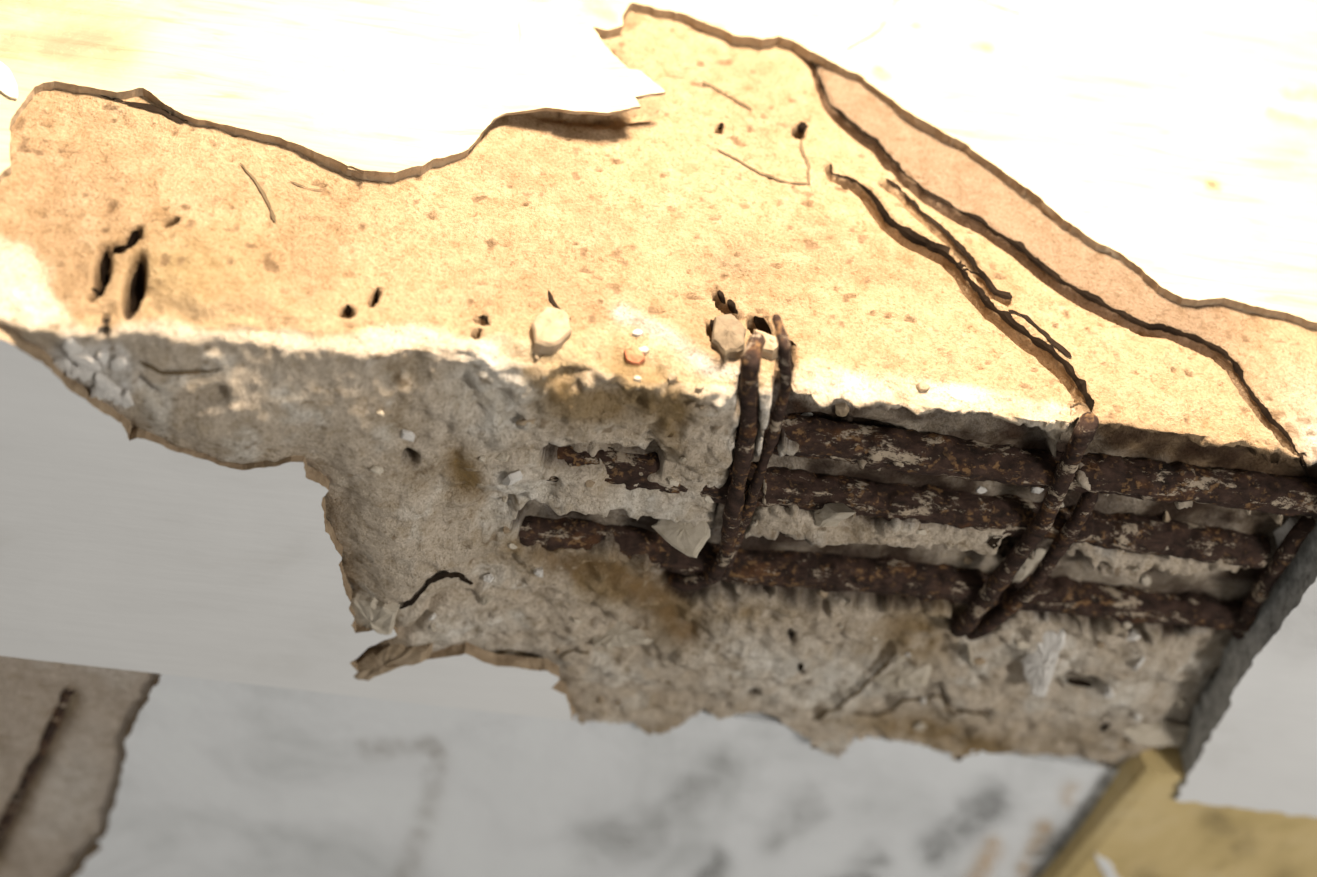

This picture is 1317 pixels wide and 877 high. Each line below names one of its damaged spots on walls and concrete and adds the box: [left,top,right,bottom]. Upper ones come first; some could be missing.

peeling [458,0,665,153]
spalling [131,261,144,313]
spalling [529,307,572,355]
crack [717,61,1311,479]
spalling [751,329,780,464]
spalling [652,519,710,558]
spalling [739,480,1019,574]
spalling [1050,462,1317,601]
crack [400,571,473,609]
spalling [353,643,433,681]
spalling [1021,628,1066,697]
spalling [0,656,159,877]